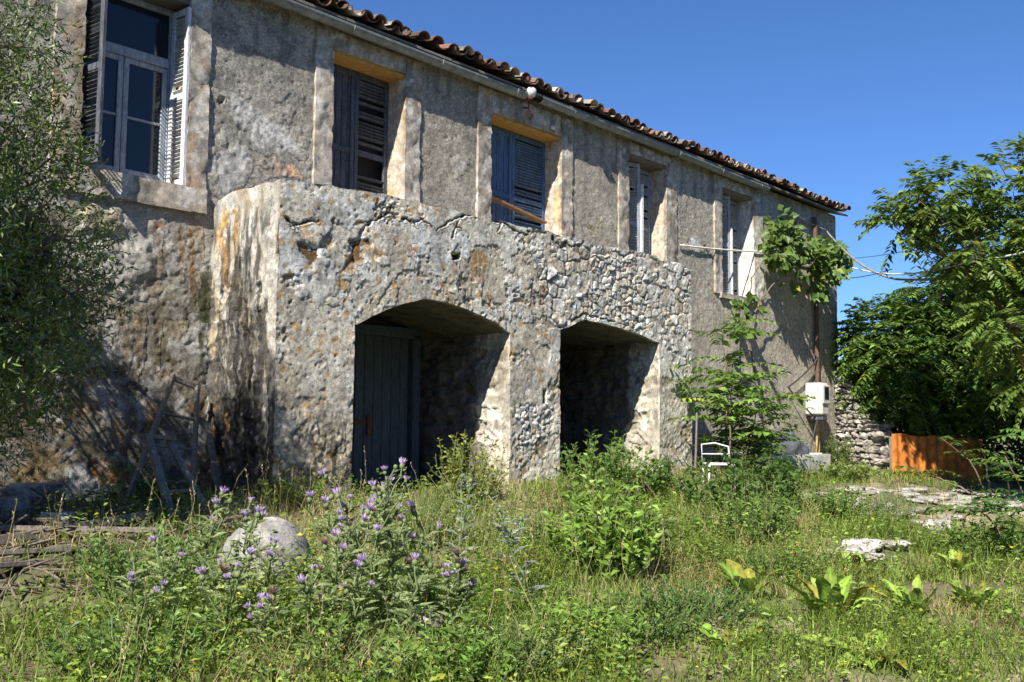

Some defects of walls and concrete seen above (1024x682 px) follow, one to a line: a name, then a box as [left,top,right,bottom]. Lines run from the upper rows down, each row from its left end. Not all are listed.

rust [151,203,240,314]
crack [284,215,321,232]
crack [349,205,566,253]
water stain [196,243,352,503]